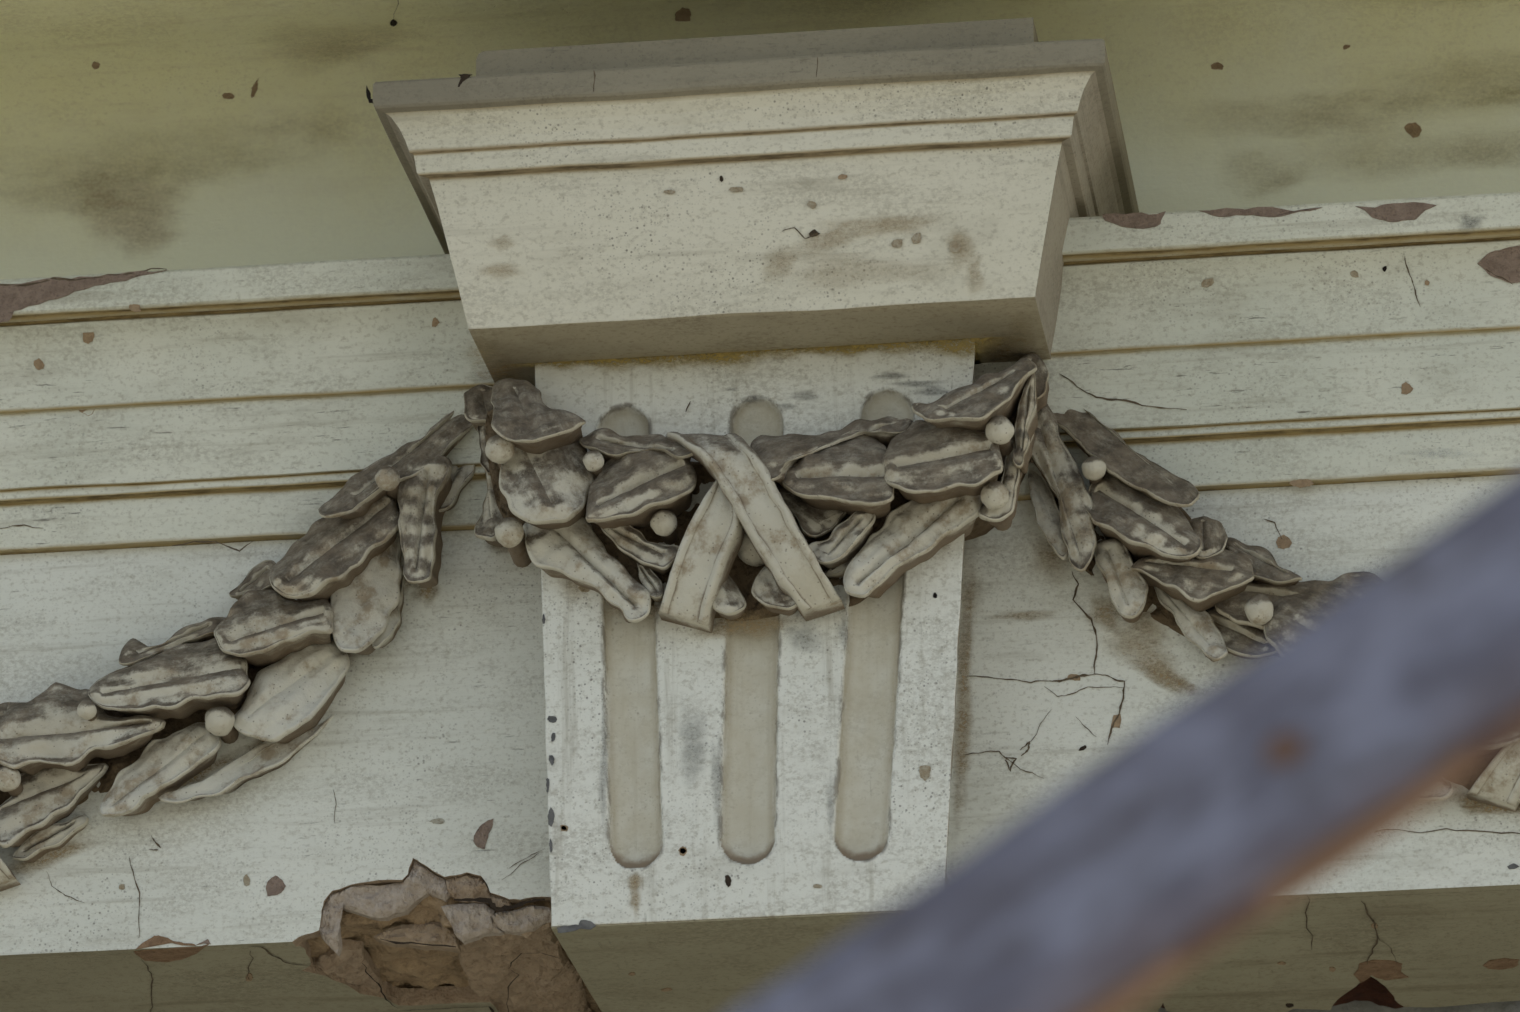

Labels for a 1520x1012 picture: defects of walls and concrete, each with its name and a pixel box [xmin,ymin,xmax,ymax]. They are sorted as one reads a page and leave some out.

peeling [1477,246,1520,284]
flaking render [0,268,167,323]
crack [1059,373,1187,410]
crack [964,572,1125,778]
flaking render [307,860,602,1012]
crack [1305,897,1313,948]
crack [1361,901,1397,964]
peeling [1354,960,1409,983]